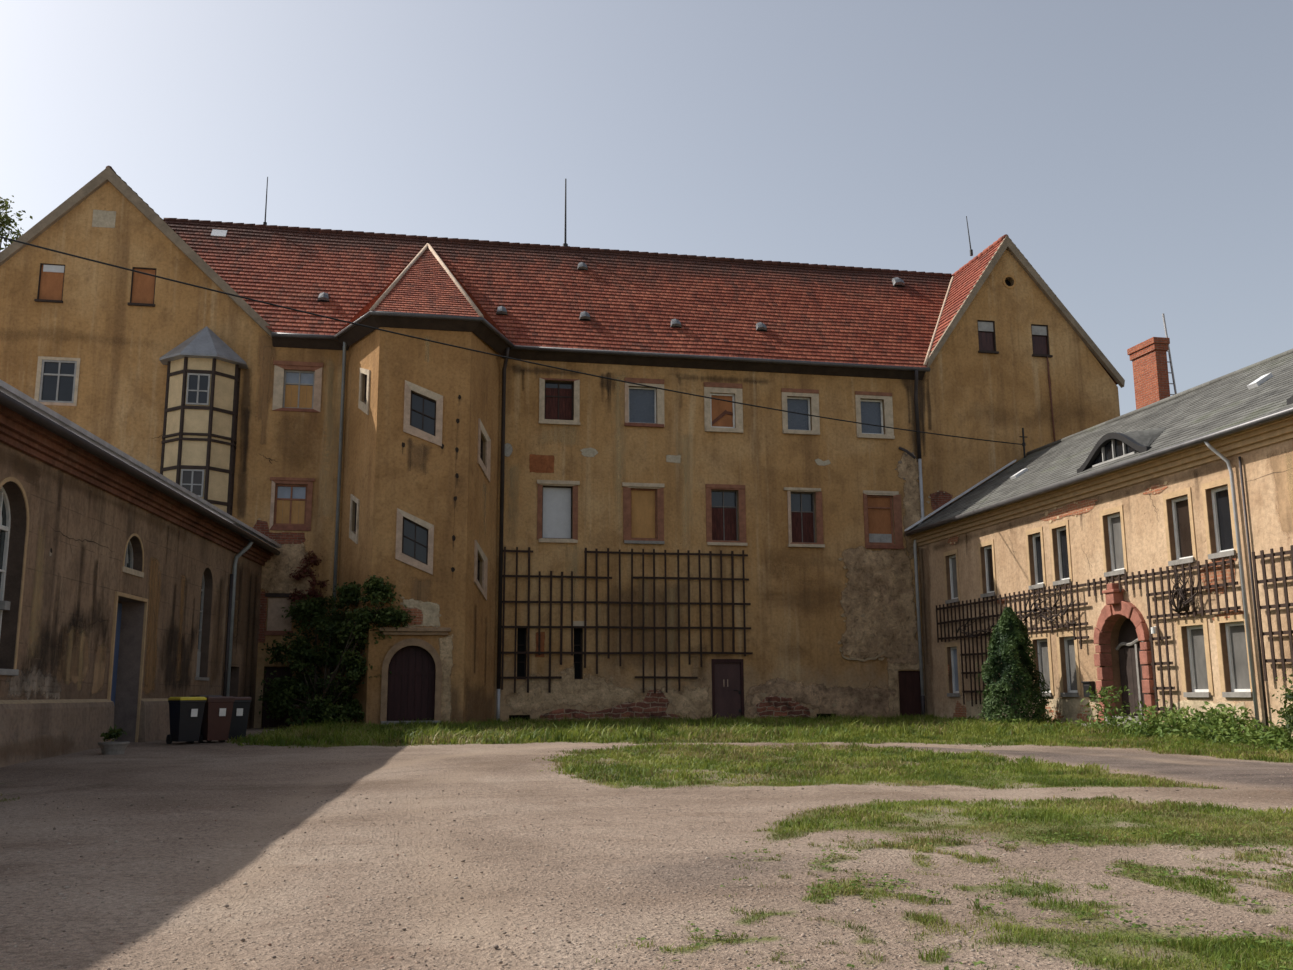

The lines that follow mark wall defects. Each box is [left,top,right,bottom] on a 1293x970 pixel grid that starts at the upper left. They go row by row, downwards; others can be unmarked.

leakage [7,561,108,700]
peeling [506,667,711,722]
peeling [744,655,924,720]